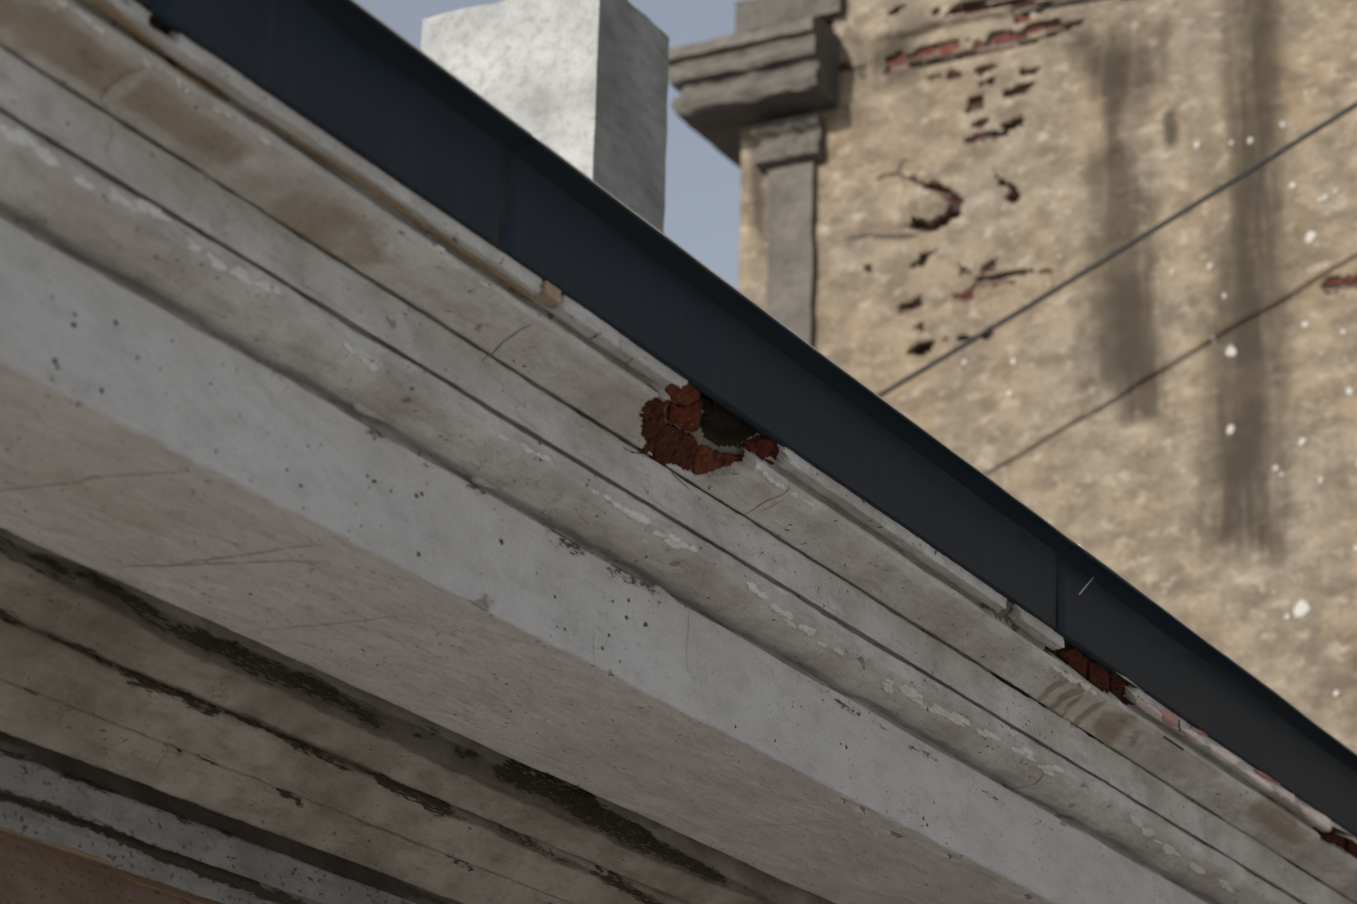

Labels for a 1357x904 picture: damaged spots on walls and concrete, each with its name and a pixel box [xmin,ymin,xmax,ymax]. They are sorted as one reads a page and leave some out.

flaking render [885,0,1082,145]
leakage [1166,112,1174,143]
spalling [909,176,964,233]
spalling [952,263,1052,303]
leakage [1079,37,1156,414]
leakage [1218,0,1275,538]
spalling [1321,275,1357,295]
spalling [577,383,814,519]
leakage [0,532,393,730]
leakage [47,633,472,830]
spalling [994,674,1104,744]
peeling [1044,640,1357,859]